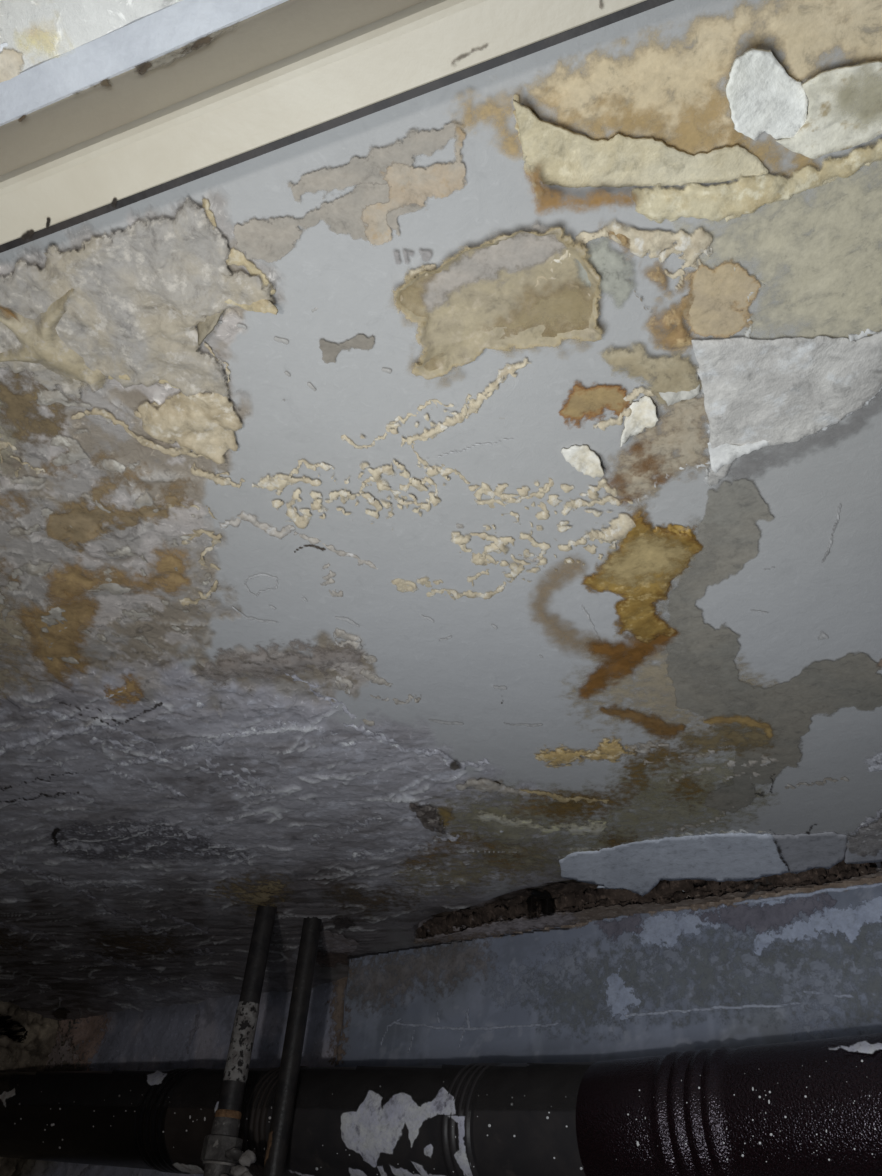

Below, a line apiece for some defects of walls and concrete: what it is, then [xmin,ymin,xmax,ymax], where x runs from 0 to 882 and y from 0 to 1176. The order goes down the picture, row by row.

peeling [0,43,882,600]
corrosion [608,231,629,252]
corrosion [647,266,667,290]
corrosion [534,274,709,699]
peeling [40,605,66,633]
peeling [78,489,222,642]
peeling [196,628,421,705]
water stain [323,386,882,916]
spalling [409,803,454,834]
corrosion [515,705,774,824]
peeling [413,809,882,956]
peeling [600,965,641,1020]